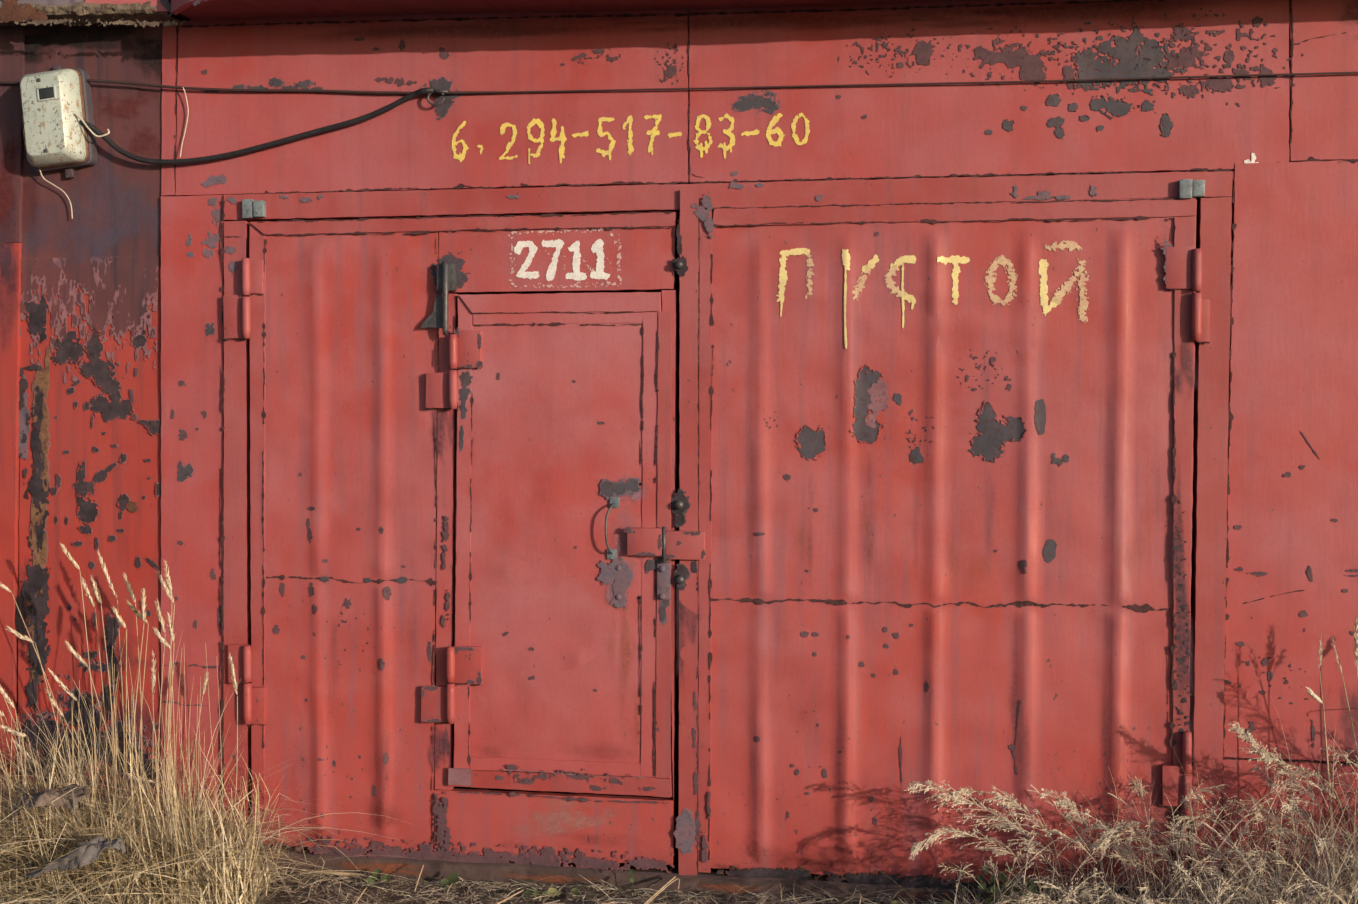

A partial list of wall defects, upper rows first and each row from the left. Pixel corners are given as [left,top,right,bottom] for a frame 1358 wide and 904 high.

peeling [838,8,1304,139]
peeling [15,256,207,806]
peeling [599,477,641,500]
peeling [597,489,706,625]
peeling [795,425,827,460]
peeling [851,364,935,464]
peeling [957,350,1047,463]
peeling [485,765,656,791]